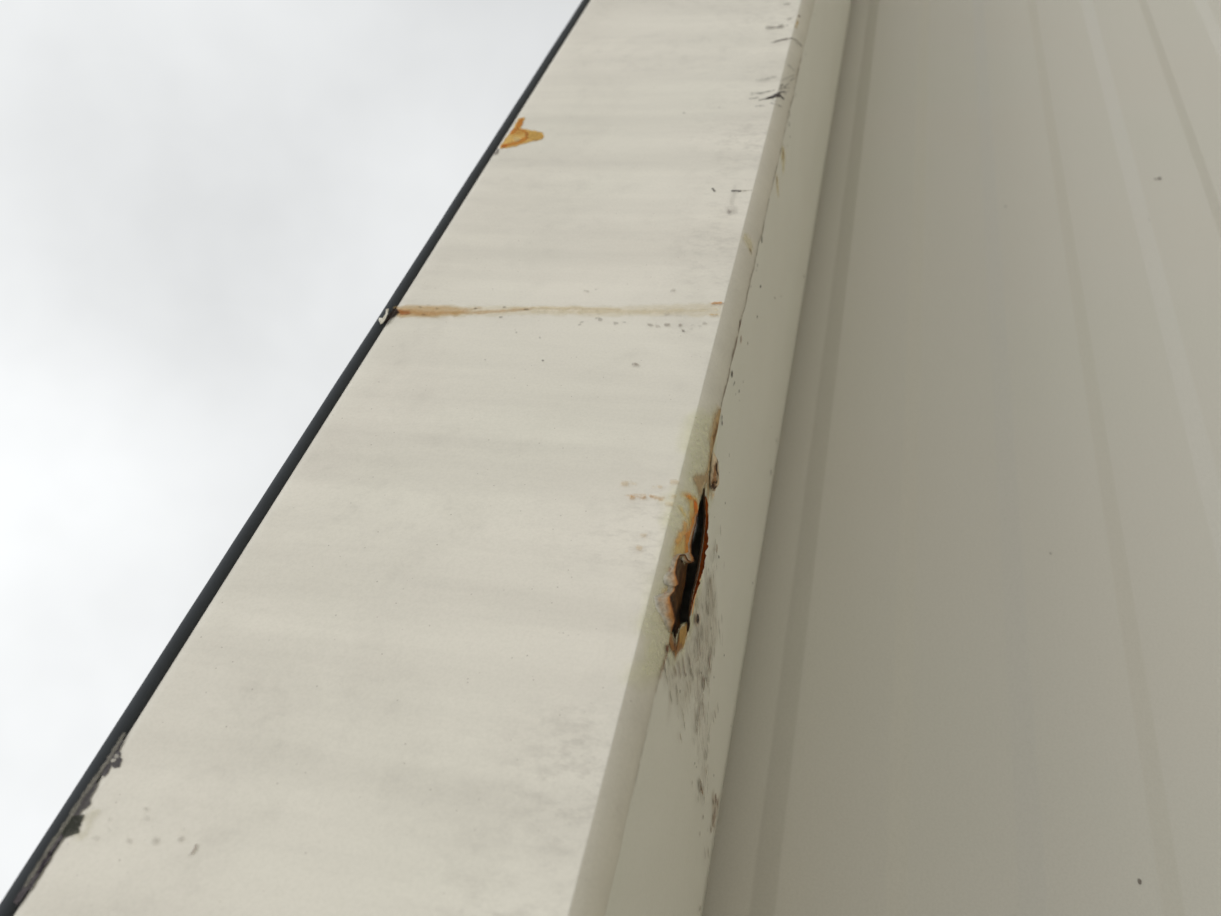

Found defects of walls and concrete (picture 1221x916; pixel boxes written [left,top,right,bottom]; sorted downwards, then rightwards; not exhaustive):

corrosion [494,117,544,154]
corrosion [379,307,409,324]
corrosion [653,496,709,640]